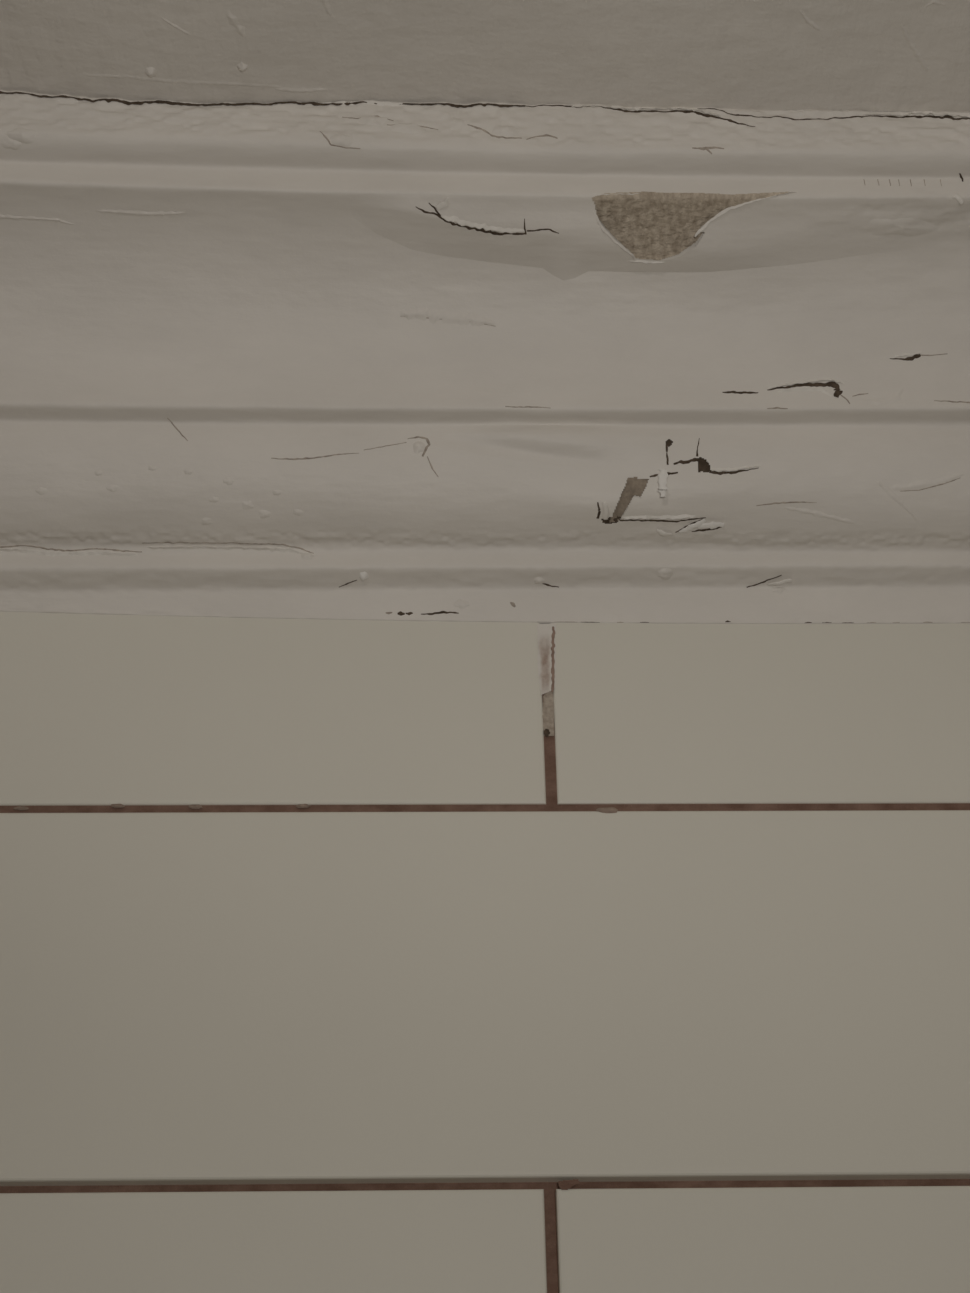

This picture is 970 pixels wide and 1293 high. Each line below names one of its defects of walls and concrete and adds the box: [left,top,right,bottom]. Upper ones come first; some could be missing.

crack [0,91,970,127]
crack [416,197,559,235]
peeling [592,191,796,264]
crack [722,378,868,409]
peeling [597,438,761,536]